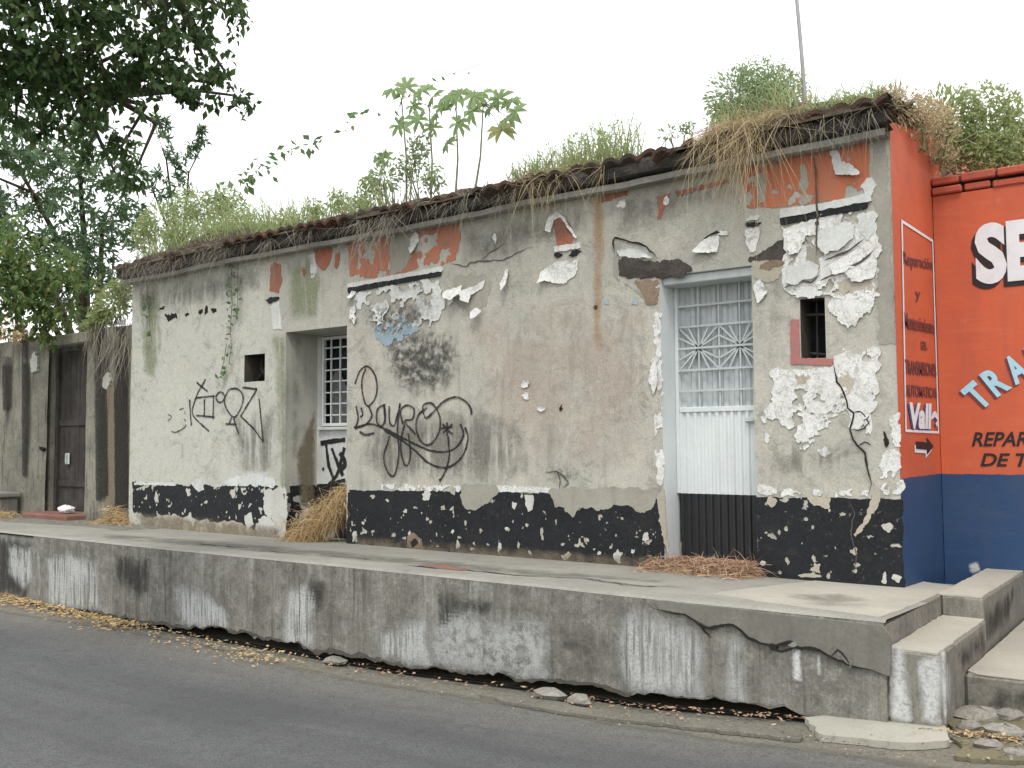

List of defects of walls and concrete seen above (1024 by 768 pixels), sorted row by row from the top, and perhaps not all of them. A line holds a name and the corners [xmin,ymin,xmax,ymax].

peeling [334,223,508,347]
crack [452,243,528,267]
spalling [537,212,581,284]
leakage [392,333,454,386]
peeling [742,139,906,555]
spalling [370,231,728,564]
crack [832,361,872,575]
peeling [134,471,312,538]
peeling [798,563,822,578]
peeling [881,572,902,584]